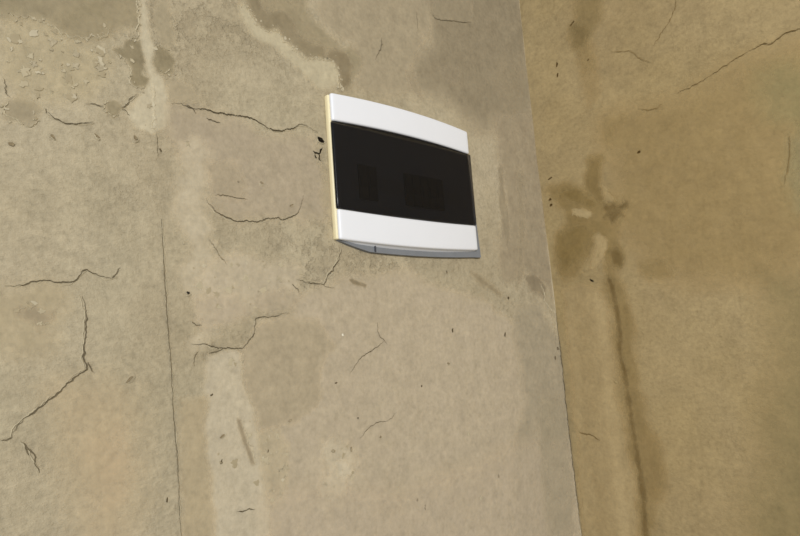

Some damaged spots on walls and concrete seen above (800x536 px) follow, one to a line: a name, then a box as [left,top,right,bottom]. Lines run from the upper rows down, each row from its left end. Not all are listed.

crack [681,28,800,91]
crack [171,103,322,161]
crack [205,194,304,224]
crack [292,249,342,292]
damp [244,0,800,536]
crack [191,313,288,363]
crack [1,268,119,473]